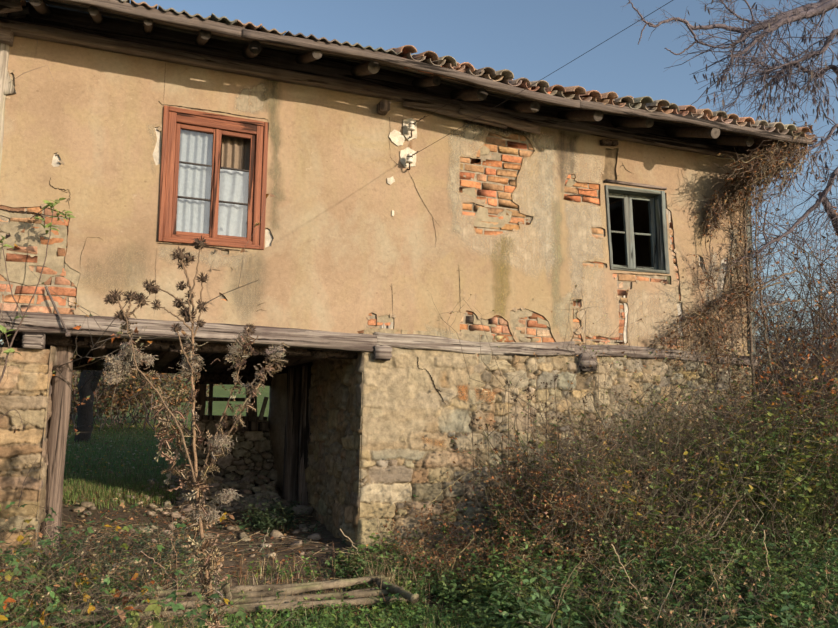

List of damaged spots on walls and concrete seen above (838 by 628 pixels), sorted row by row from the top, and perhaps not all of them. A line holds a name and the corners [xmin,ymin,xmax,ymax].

flaking render [459,132,534,236]
flaking render [564,148,619,206]
crack [0,209,50,225]
flaking render [0,204,81,315]
flaking render [572,215,685,349]
flaking render [357,313,397,334]
flaking render [457,307,555,342]